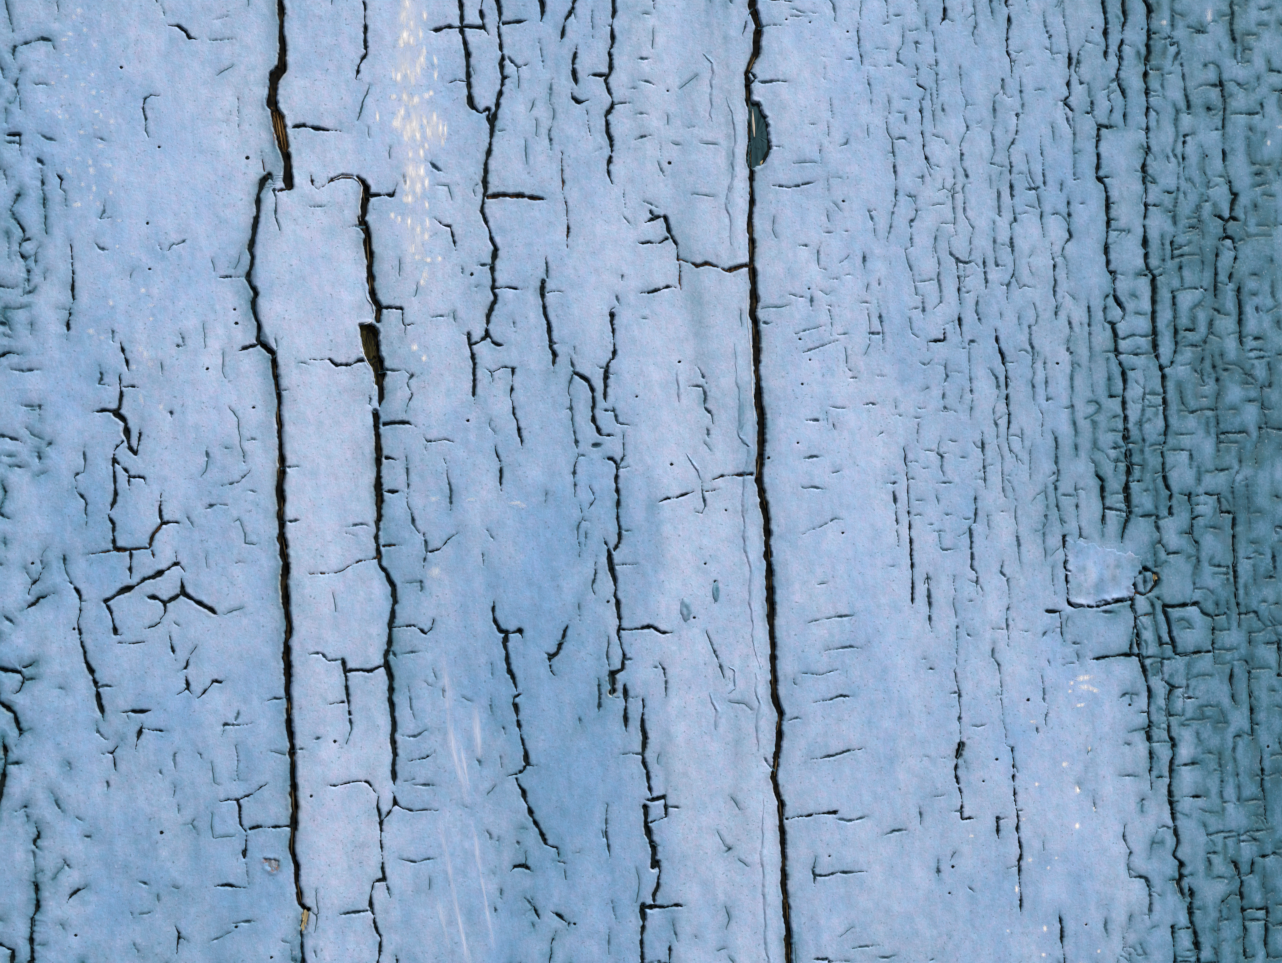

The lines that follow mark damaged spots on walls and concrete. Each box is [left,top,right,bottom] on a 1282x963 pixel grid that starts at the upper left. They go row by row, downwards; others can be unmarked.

crack [0,0,111,372]
crack [142,95,159,138]
peeling [747,101,771,169]
crack [0,330,257,791]
crack [156,0,697,963]
crack [560,0,1282,963]
peeling [1064,538,1158,607]
crack [0,662,91,963]
crack [130,881,255,954]